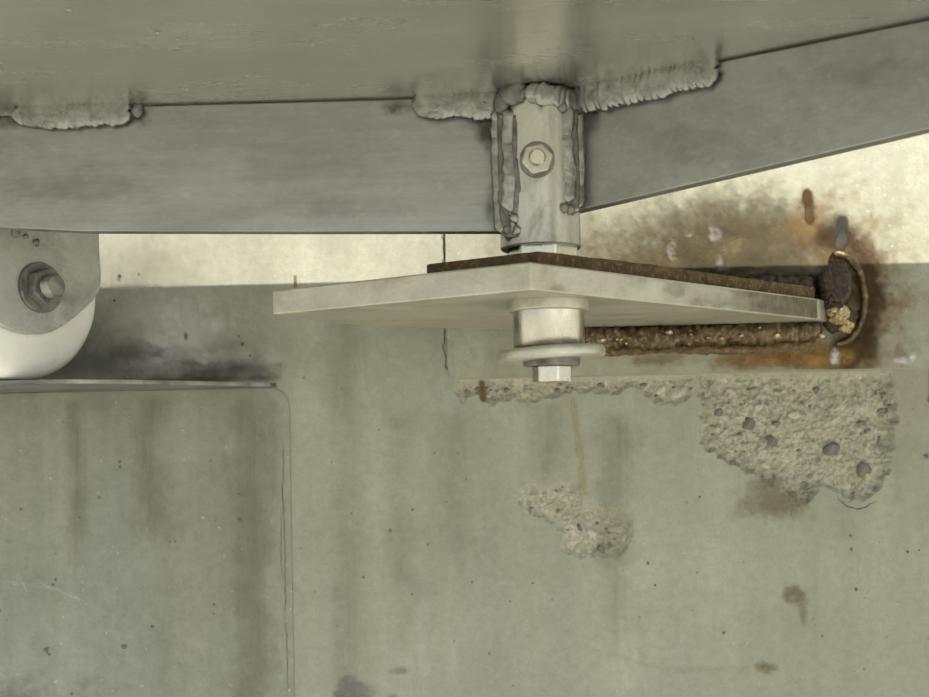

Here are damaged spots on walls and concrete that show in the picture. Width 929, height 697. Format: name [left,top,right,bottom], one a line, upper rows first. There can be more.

corrosion [587,189,890,369]
spalling [451,354,914,506]
spalling [511,480,634,561]